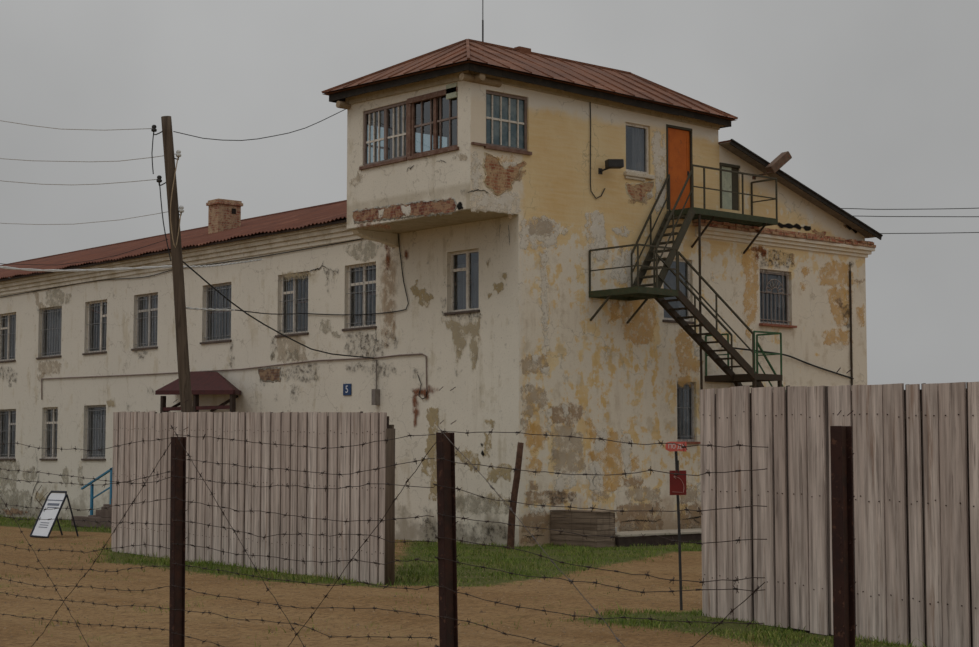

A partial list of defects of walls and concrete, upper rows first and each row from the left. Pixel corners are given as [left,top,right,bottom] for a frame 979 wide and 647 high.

spalling [352,197,457,229]
spalling [464,151,526,218]
peeling [585,210,636,284]
peeling [625,131,667,212]
peeling [410,280,434,306]
peeling [742,246,865,345]
leakage [446,319,480,368]
peeling [421,407,439,501]
peeling [455,420,512,506]
spalling [520,385,663,544]